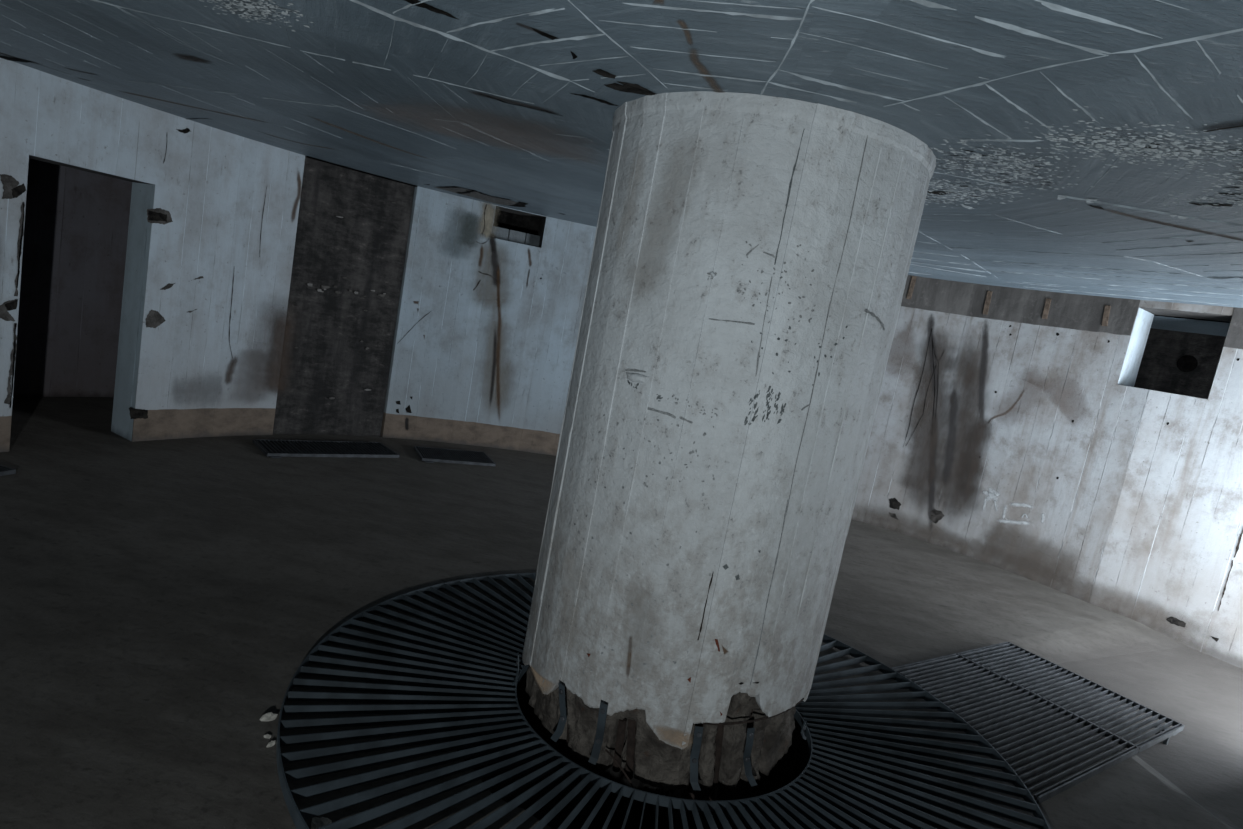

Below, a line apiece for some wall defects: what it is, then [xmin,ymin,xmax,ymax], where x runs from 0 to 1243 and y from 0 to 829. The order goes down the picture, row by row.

crack [1204,122,1243,132]
leakage [865,317,1170,625]
crack [1218,529,1243,611]
spalling [466,665,804,829]